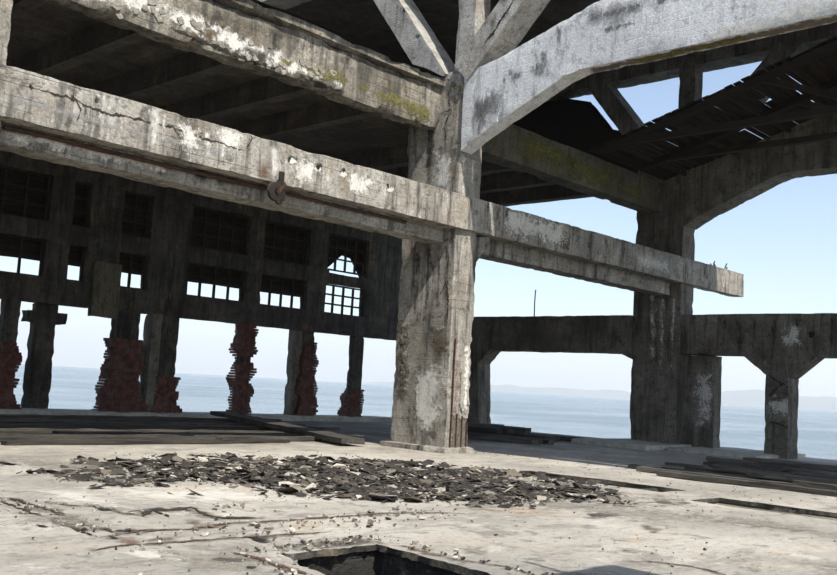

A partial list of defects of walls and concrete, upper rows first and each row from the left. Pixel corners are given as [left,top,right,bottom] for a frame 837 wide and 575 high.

peeling [100,0,342,88]
crack [31,86,256,150]
spalling [431,325,470,448]
crack [0,497,465,575]
crack [456,559,535,575]
crack [636,560,726,575]